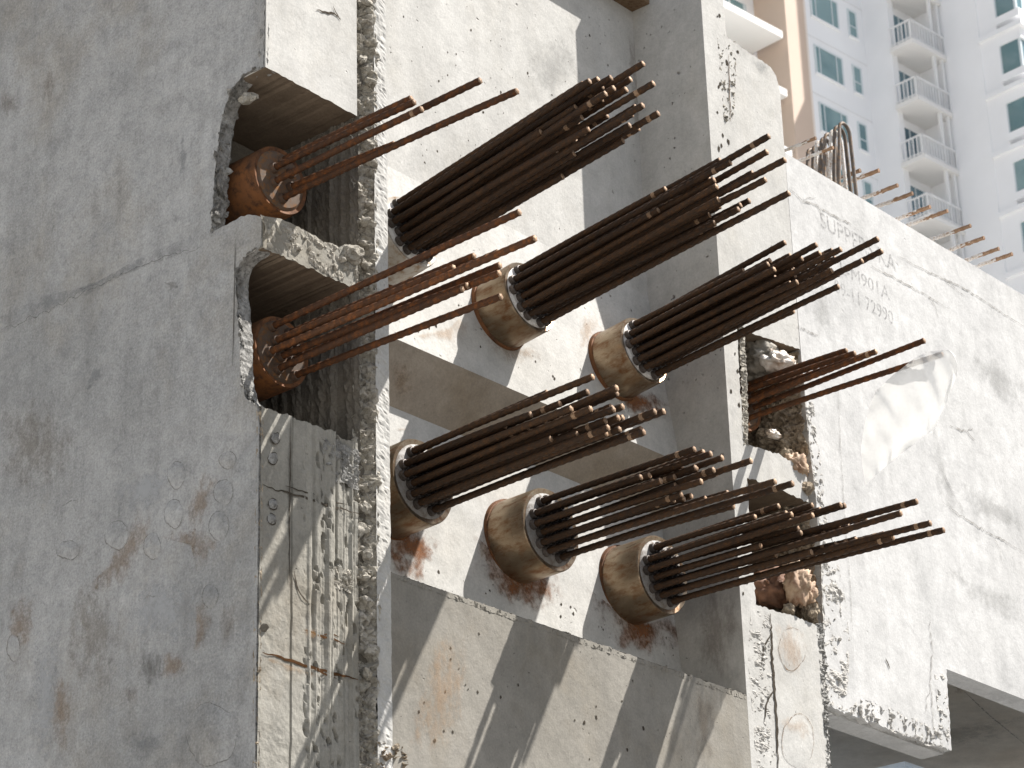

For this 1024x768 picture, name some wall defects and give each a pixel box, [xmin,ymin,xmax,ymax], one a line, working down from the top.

spalling [210,26,269,233]
spalling [235,0,388,767]
crack [262,652,358,680]
corrosion [391,535,431,577]
corrosion [486,551,551,603]
spalling [320,325,950,768]
corrosion [603,601,677,648]
crack [762,614,779,768]